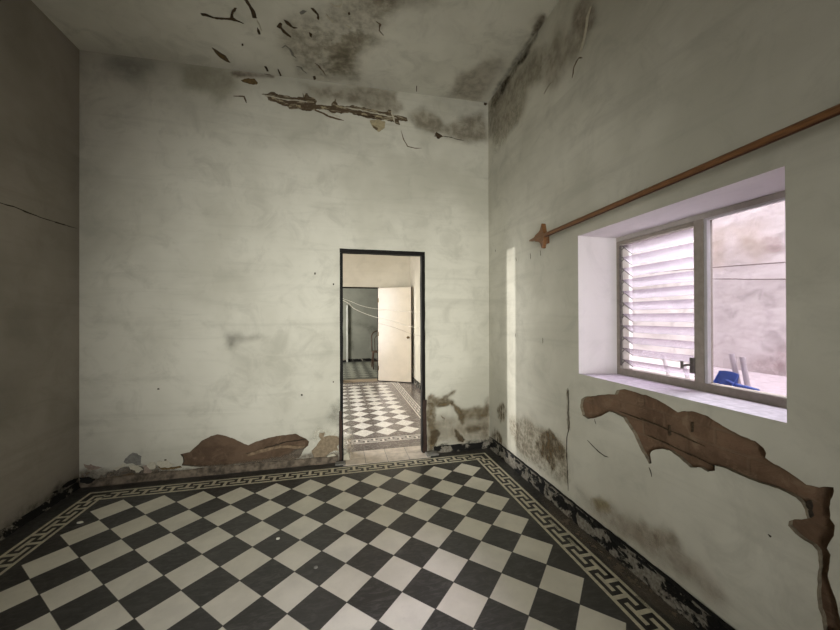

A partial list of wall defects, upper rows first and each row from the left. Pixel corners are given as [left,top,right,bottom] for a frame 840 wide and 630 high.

peeling [201,8,244,24]
peeling [277,20,326,80]
peeling [263,92,408,132]
crack [1,203,74,228]
spalling [158,429,351,470]
damp [426,392,504,451]
damp [516,422,567,478]
crack [564,390,572,483]
peeling [492,438,735,630]
spalling [580,389,840,630]